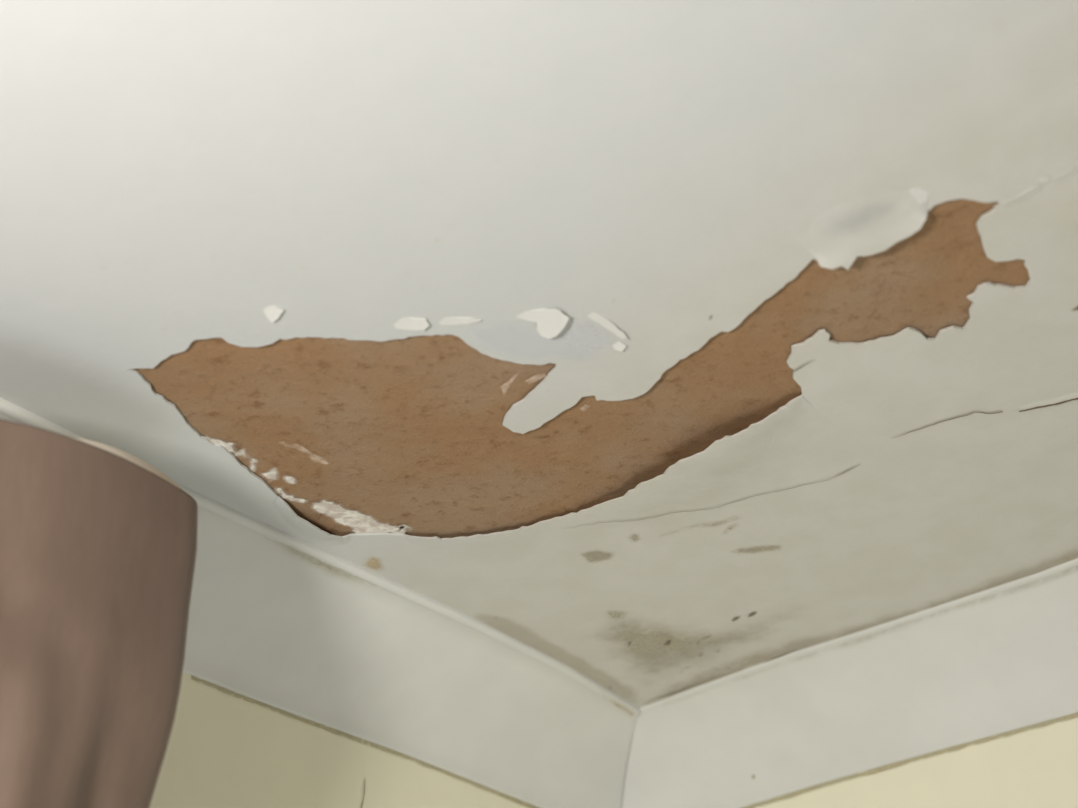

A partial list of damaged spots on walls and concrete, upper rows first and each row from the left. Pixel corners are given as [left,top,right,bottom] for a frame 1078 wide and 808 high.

peeling [132,188,1030,538]
crack [894,392,1078,438]